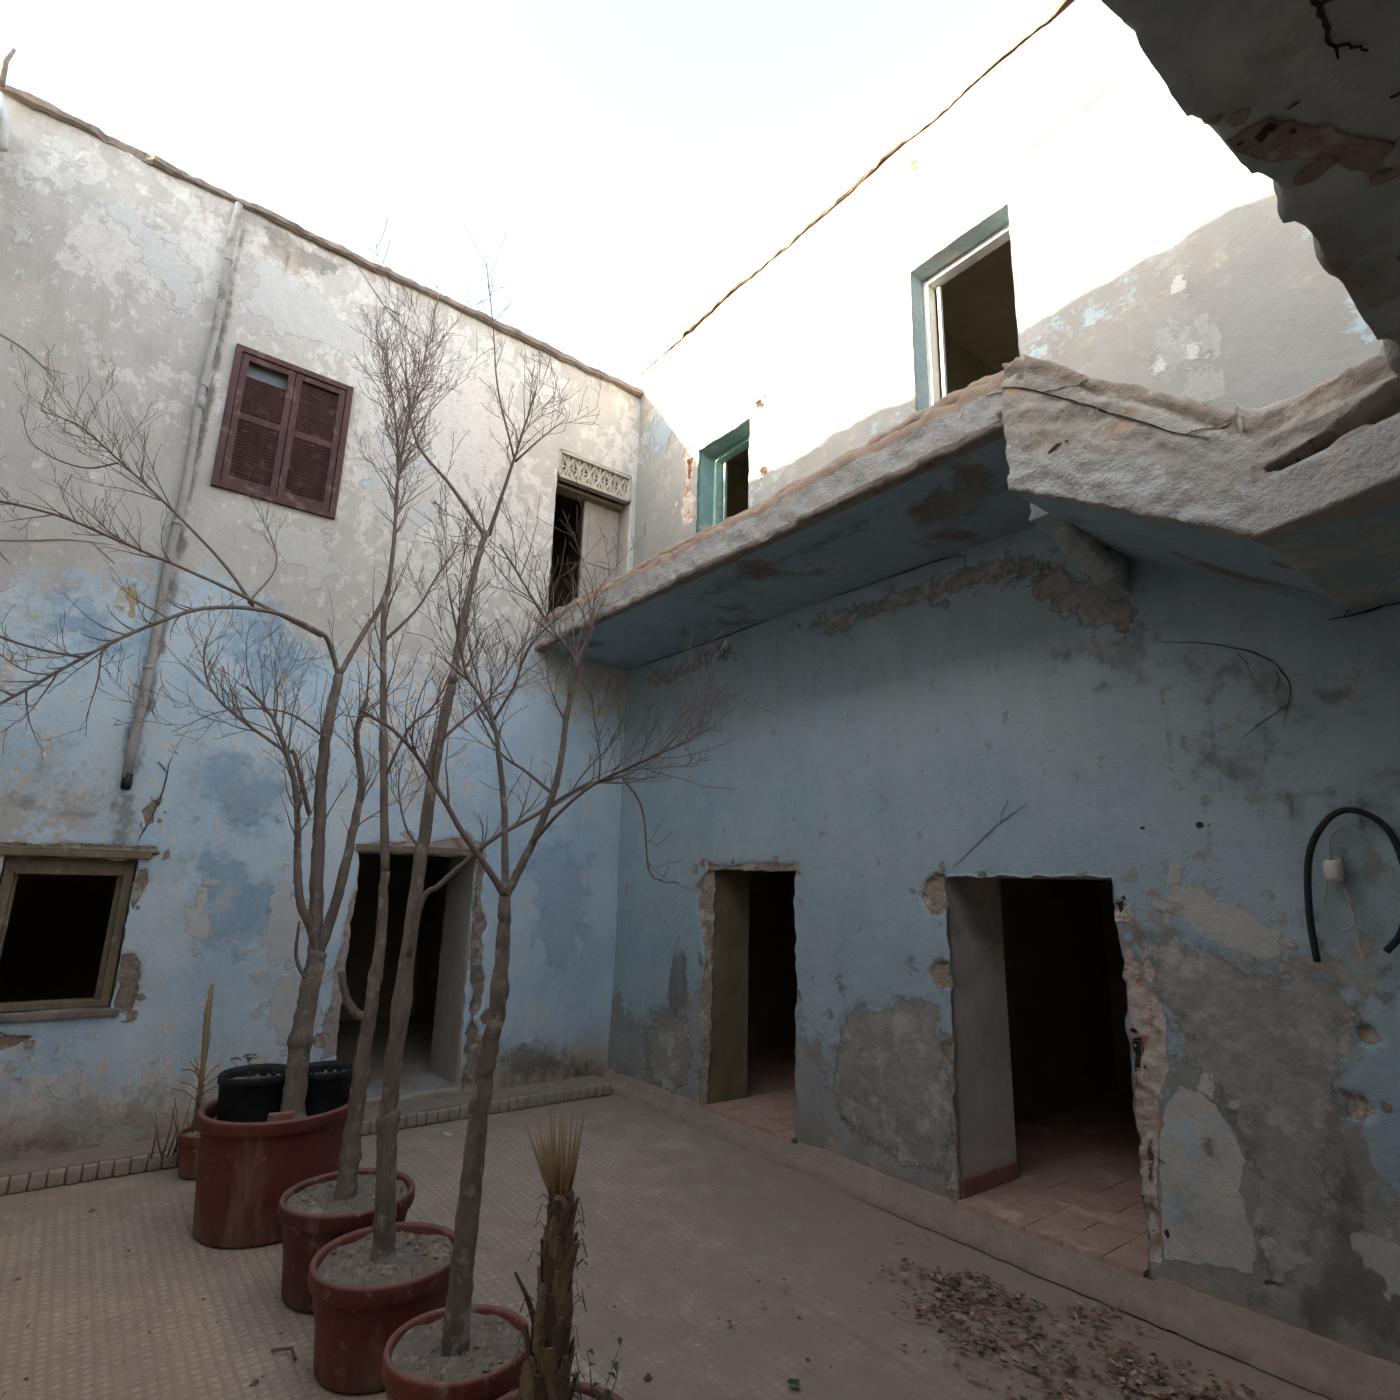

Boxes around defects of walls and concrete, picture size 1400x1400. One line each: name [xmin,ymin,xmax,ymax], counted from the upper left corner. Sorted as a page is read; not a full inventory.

crack [1310,0,1369,59]
spalling [1197,102,1400,185]
crack [986,379,1231,439]
spalling [792,548,1137,636]
spalling [0,842,170,910]
spalling [114,953,146,1023]
spalling [358,830,490,1089]
spalling [691,855,801,1109]
spalling [0,1032,35,1080]
peeling [825,956,959,1198]
peeling [1114,861,1400,1304]